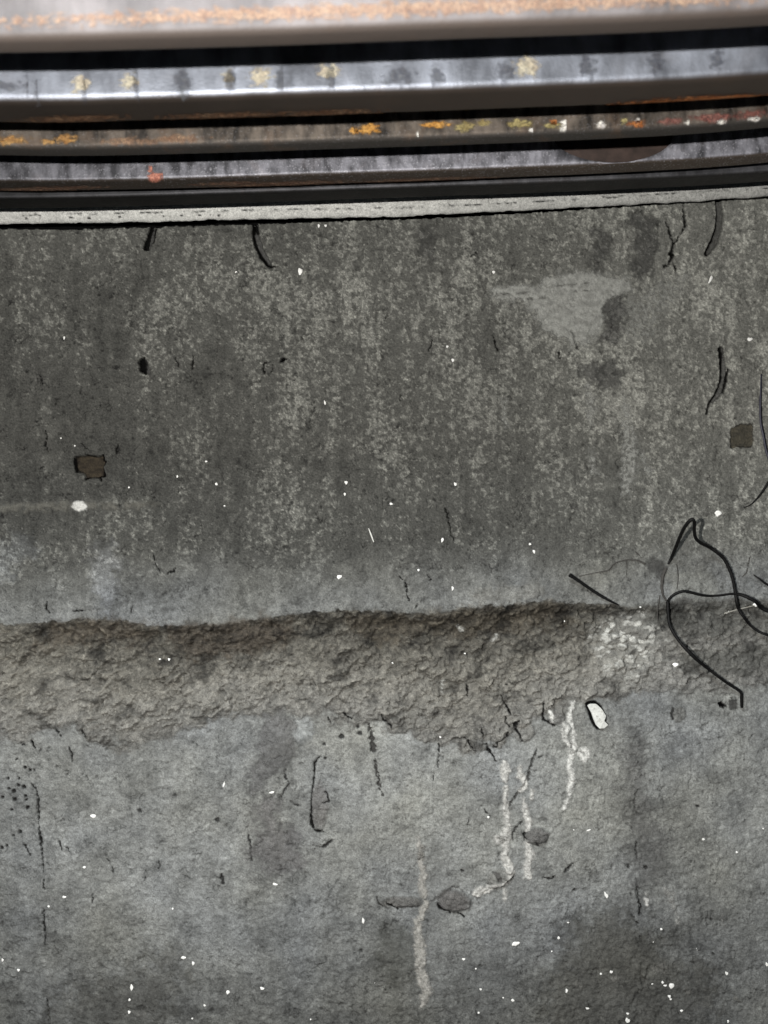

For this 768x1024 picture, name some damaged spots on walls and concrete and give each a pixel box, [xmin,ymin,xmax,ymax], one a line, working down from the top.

rust [417,119,489,137]
rust [508,119,567,132]
rust [659,111,764,125]
rust [148,166,163,183]
crack [0,193,686,269]
damp [548,701,590,810]
crack [24,784,70,939]
damp [472,760,535,900]
damp [375,840,431,1008]